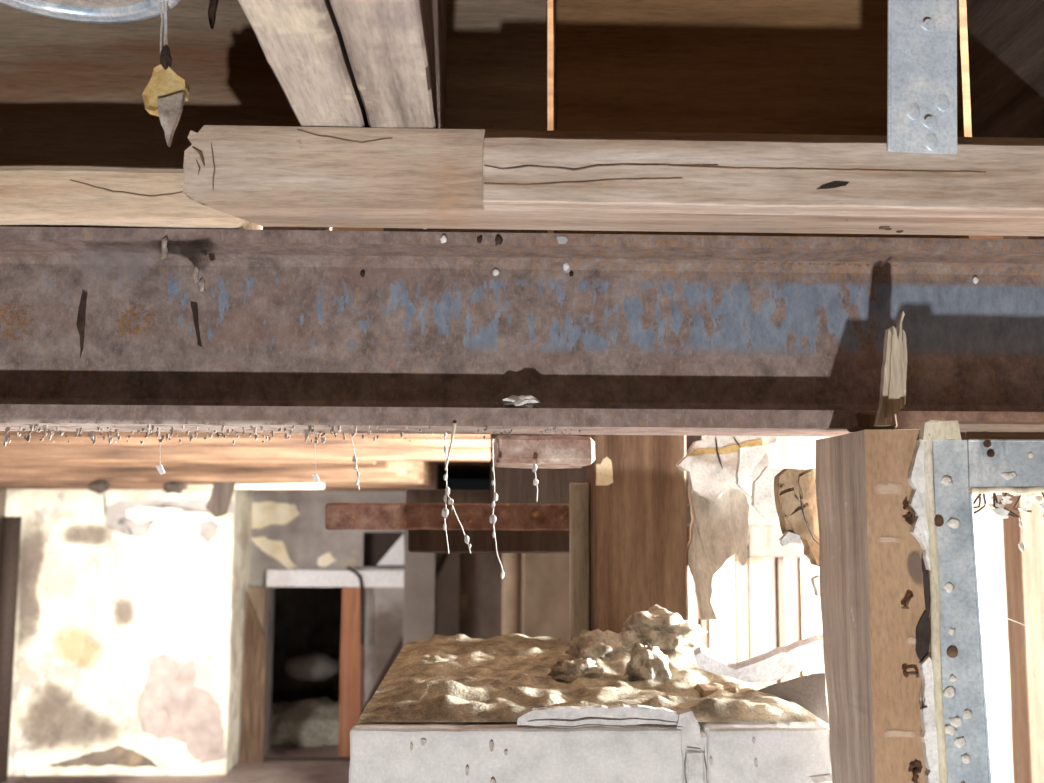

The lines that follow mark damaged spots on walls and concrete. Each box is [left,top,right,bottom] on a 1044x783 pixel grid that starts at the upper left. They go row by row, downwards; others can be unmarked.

corrosion [76,289,87,358]
corrosion [191,302,202,347]
flaking render [105,499,234,552]
peeling [251,501,300,569]
peeling [317,552,336,567]
water stain [28,686,113,748]
flaking render [138,654,226,764]
flaking render [48,745,158,767]
crack [529,724,708,783]